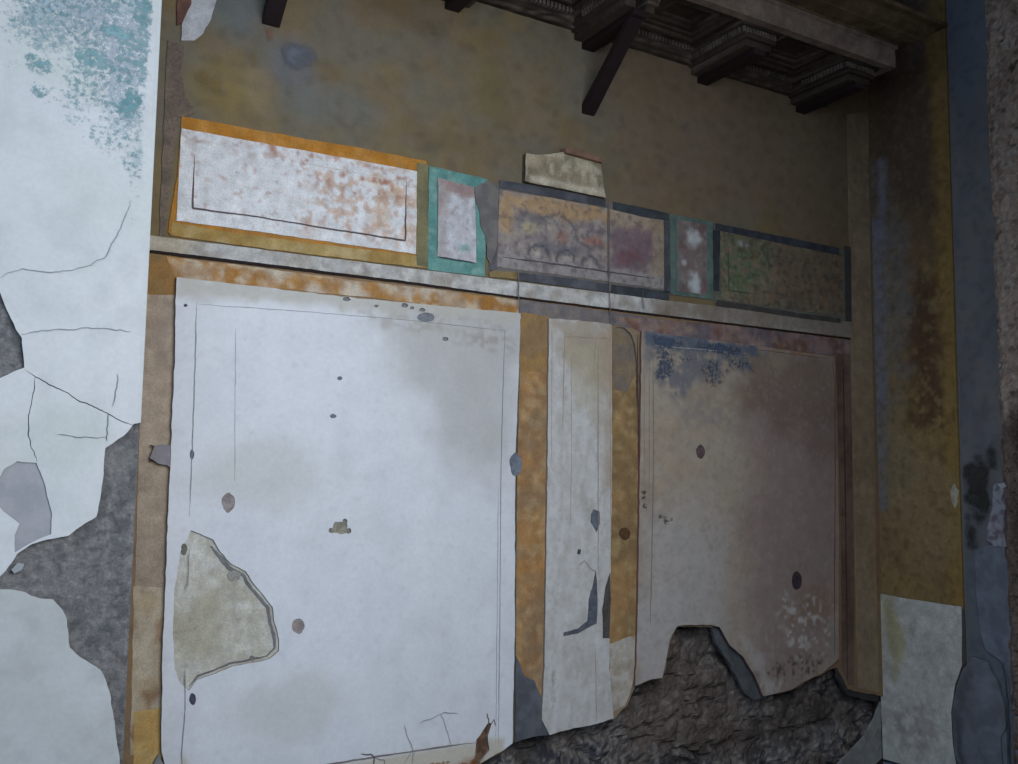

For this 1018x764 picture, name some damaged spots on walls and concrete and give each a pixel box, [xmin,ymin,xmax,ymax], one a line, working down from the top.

crack [2,205,131,277]
spalling [0,294,24,378]
crack [26,326,131,334]
crack [24,369,134,459]
peeling [221,493,235,513]
peeling [329,519,351,534]
damp [963,448,996,548]
spalling [0,423,140,764]
peeling [173,531,278,705]
peeling [292,619,304,634]
peeling [563,574,611,638]
spalling [481,626,872,764]